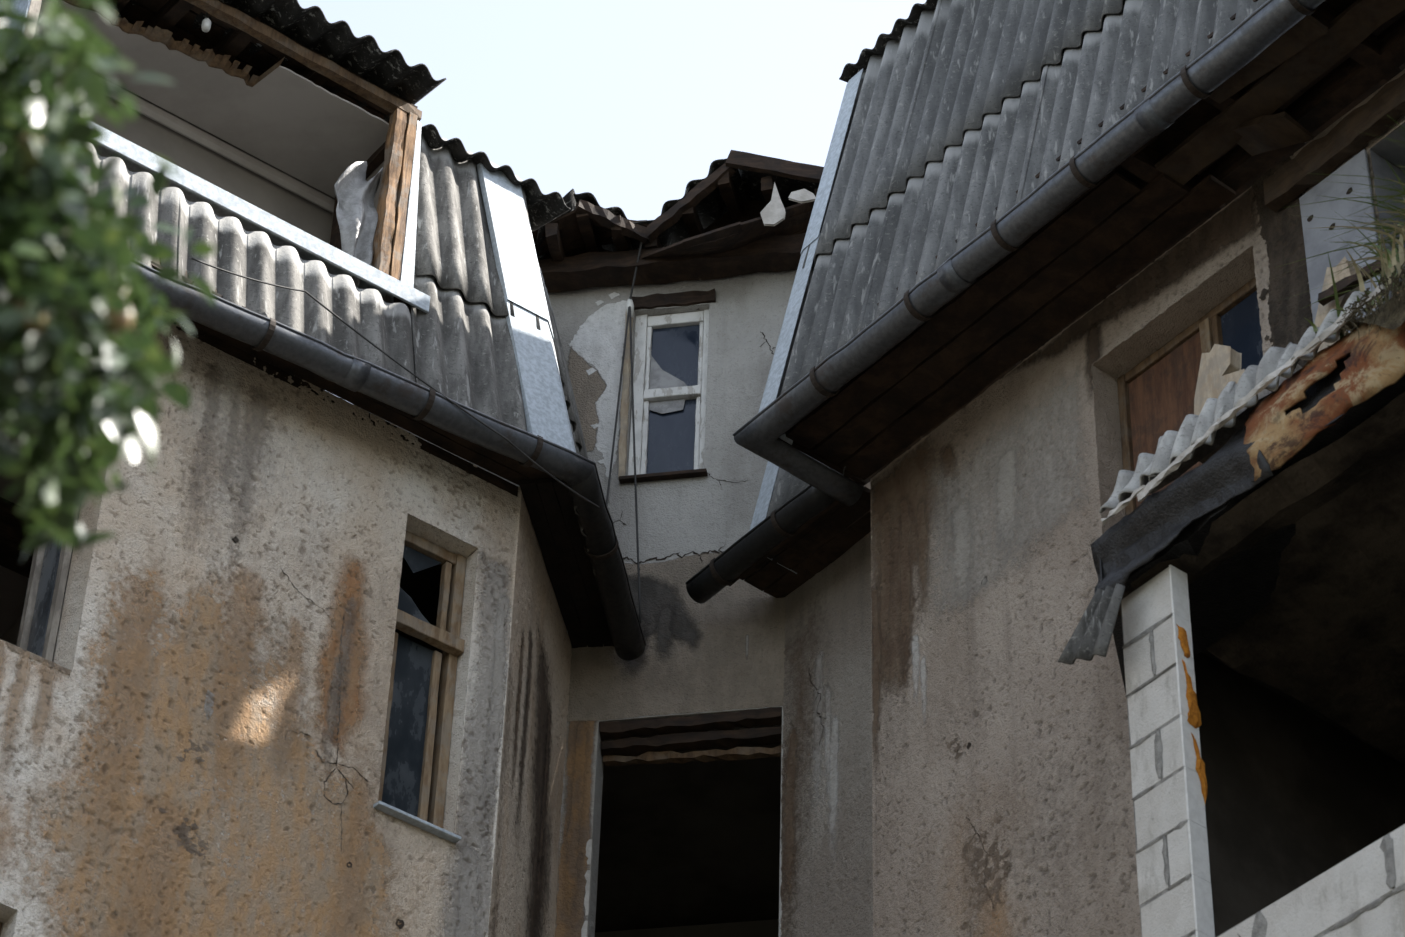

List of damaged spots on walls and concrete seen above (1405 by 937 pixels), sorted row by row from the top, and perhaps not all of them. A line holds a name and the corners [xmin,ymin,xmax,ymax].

peeling [568,292,627,477]
damp [0,641,54,752]
corrosion [24,561,402,937]
crack [271,570,369,850]